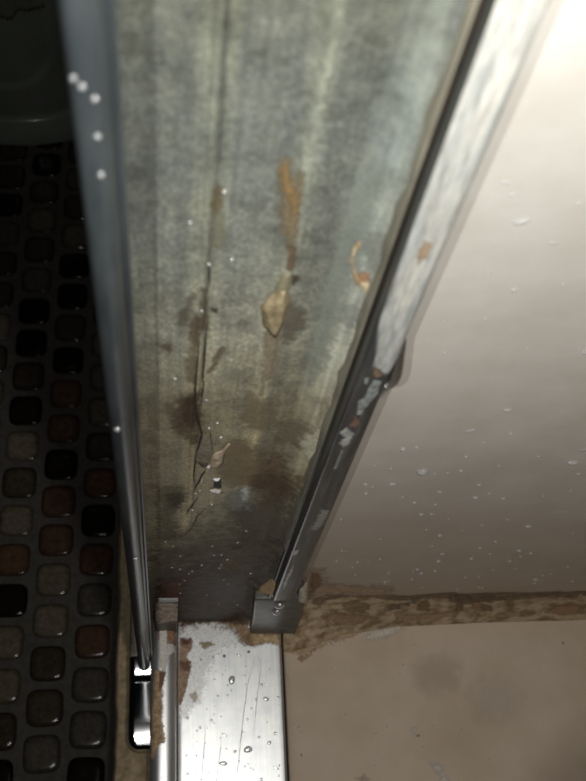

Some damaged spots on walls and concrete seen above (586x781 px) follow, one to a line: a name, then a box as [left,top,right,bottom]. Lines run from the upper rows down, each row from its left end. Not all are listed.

rust [277,158,304,271]
rust [349,240,370,293]
crack [184,320,213,536]
water stain [148,439,305,622]
peeling [298,581,308,603]